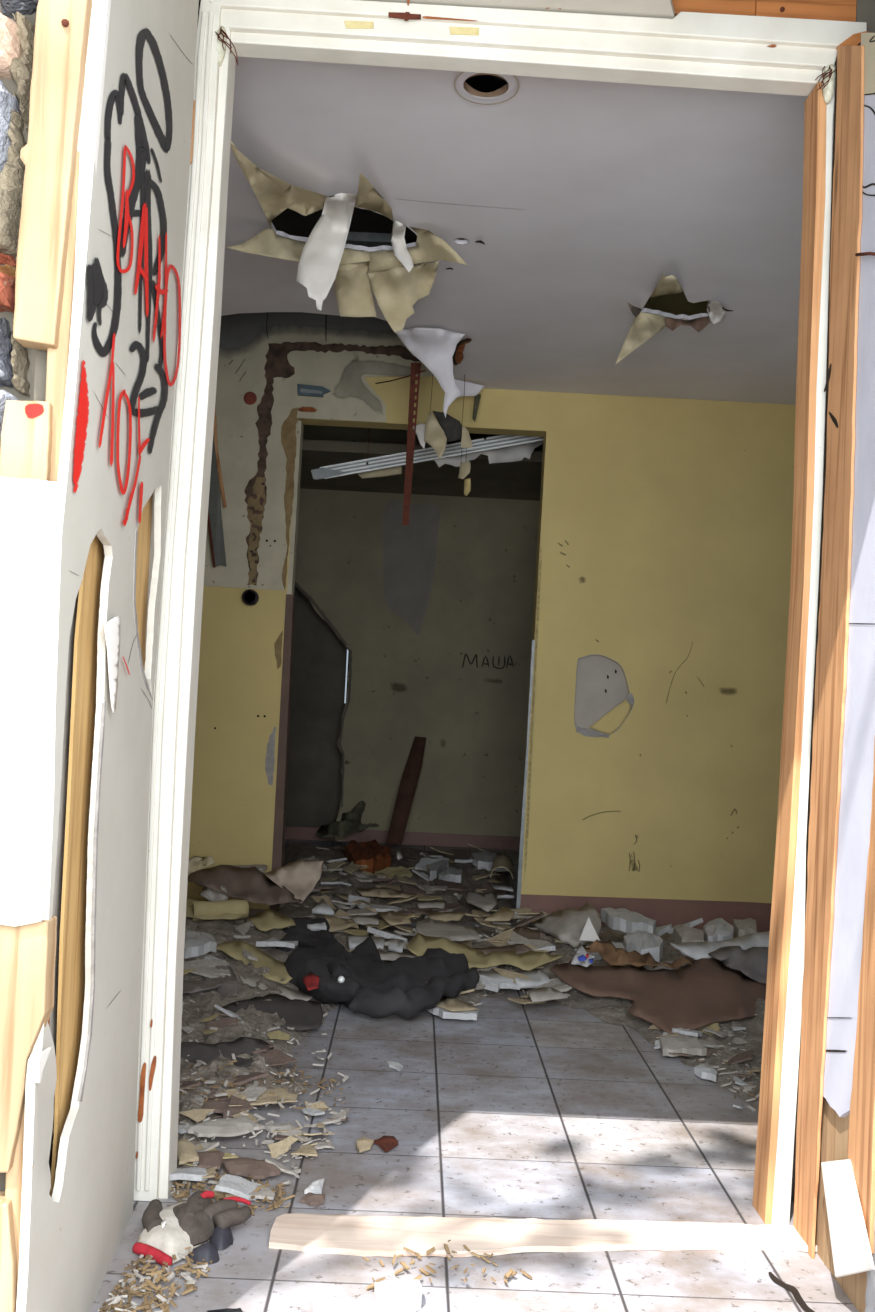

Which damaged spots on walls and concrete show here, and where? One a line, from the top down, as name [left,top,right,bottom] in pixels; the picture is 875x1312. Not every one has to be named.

spalling [574,654,634,738]
spalling [77,529,153,1102]
spalling [36,1047,52,1083]